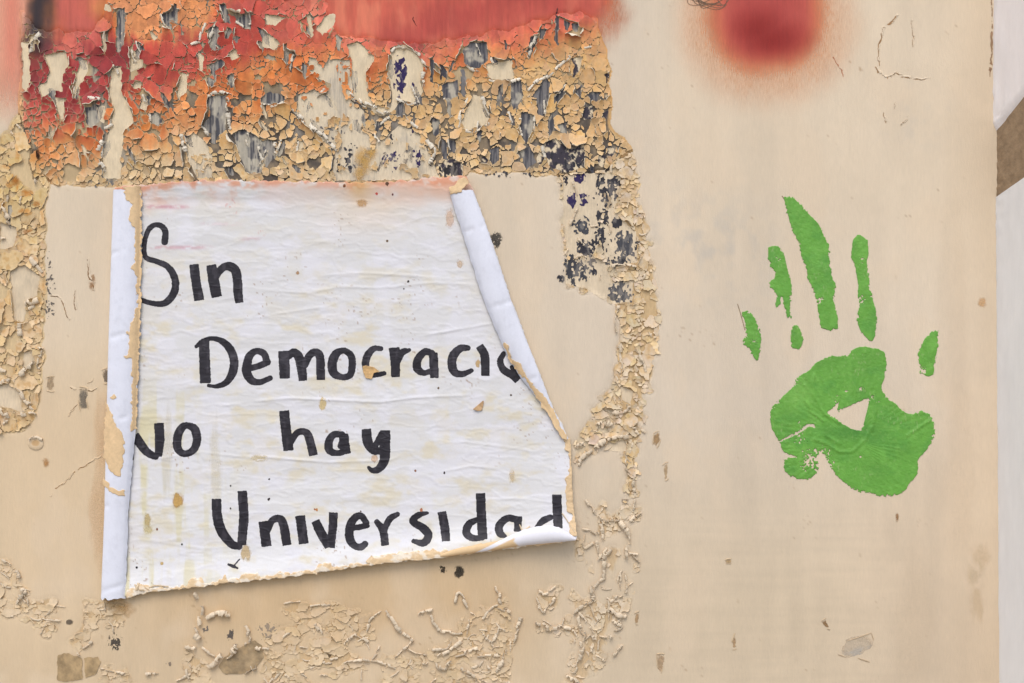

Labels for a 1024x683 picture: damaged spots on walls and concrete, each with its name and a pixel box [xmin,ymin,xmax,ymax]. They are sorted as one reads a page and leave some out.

peeling [0,0,663,683]
crack [875,14,927,125]